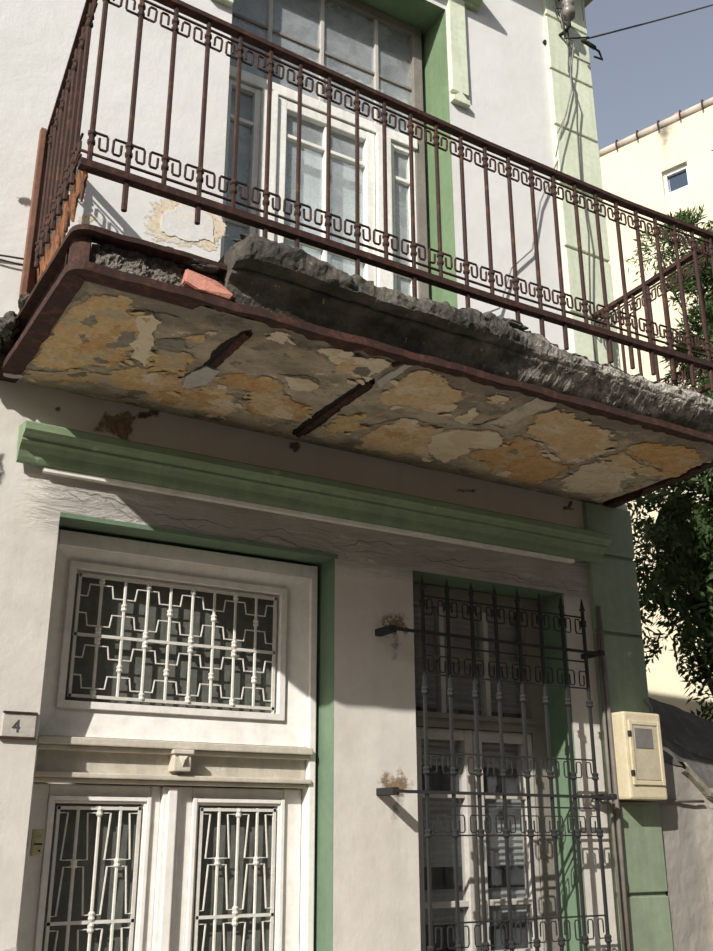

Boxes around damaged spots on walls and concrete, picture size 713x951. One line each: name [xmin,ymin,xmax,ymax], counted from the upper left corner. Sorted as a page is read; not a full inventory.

peeling [143,199,229,251]
flaking render [182,269,234,310]
peeling [0,293,712,496]
corrosion [95,410,159,440]
corrosion [381,773,407,809]